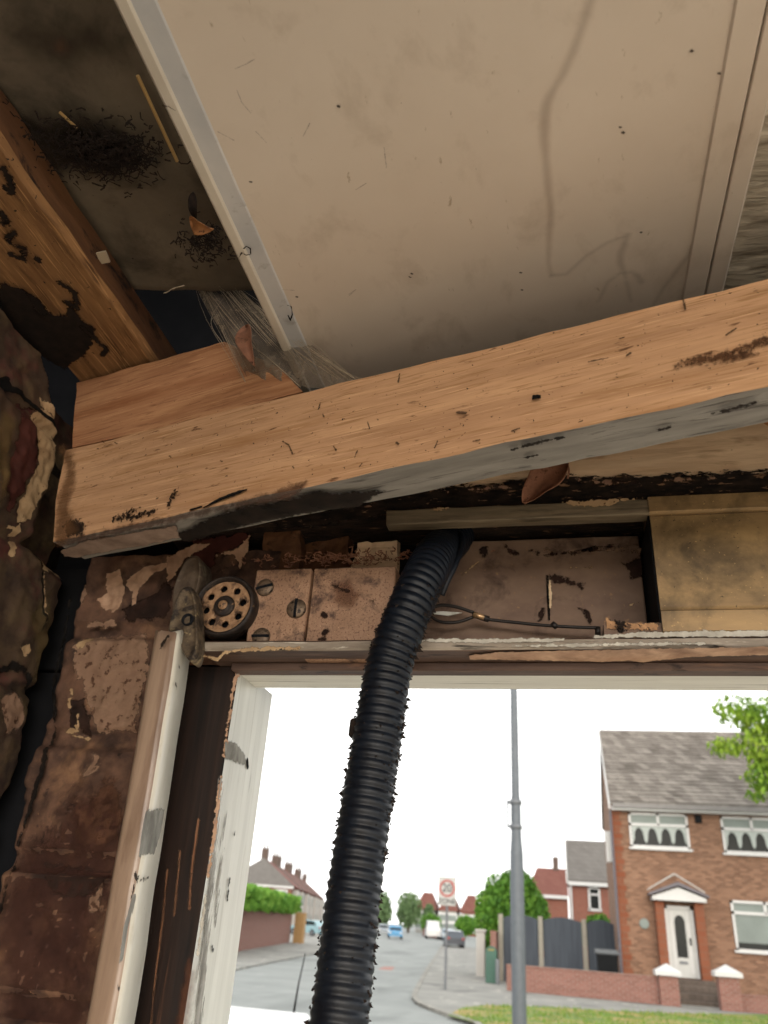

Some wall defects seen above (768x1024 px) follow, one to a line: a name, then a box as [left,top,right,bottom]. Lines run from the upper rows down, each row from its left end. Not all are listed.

peeling [6,397,57,557]
damp [55,450,384,558]
peeling [562,498,635,507]
peeling [65,532,251,741]
peeling [203,646,301,661]
spalling [1,692,25,734]
spalling [75,755,122,848]
peeling [139,808,164,857]
spalling [89,885,103,913]
peeling [119,871,149,964]